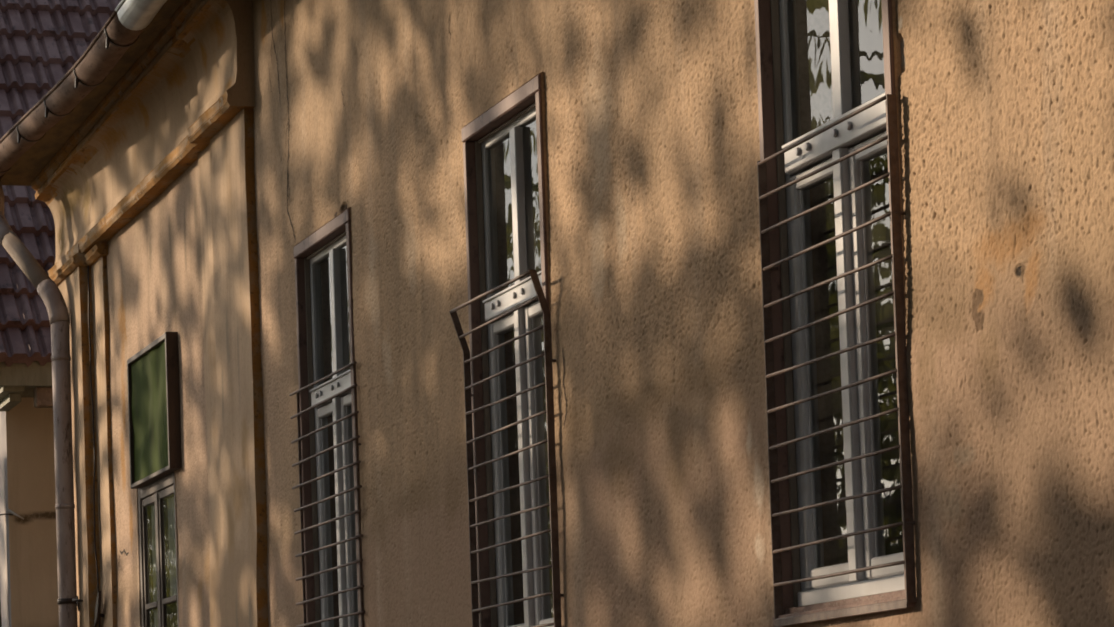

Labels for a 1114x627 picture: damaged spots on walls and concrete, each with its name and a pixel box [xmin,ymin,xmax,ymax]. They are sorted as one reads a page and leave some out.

crack [268,0,296,243]